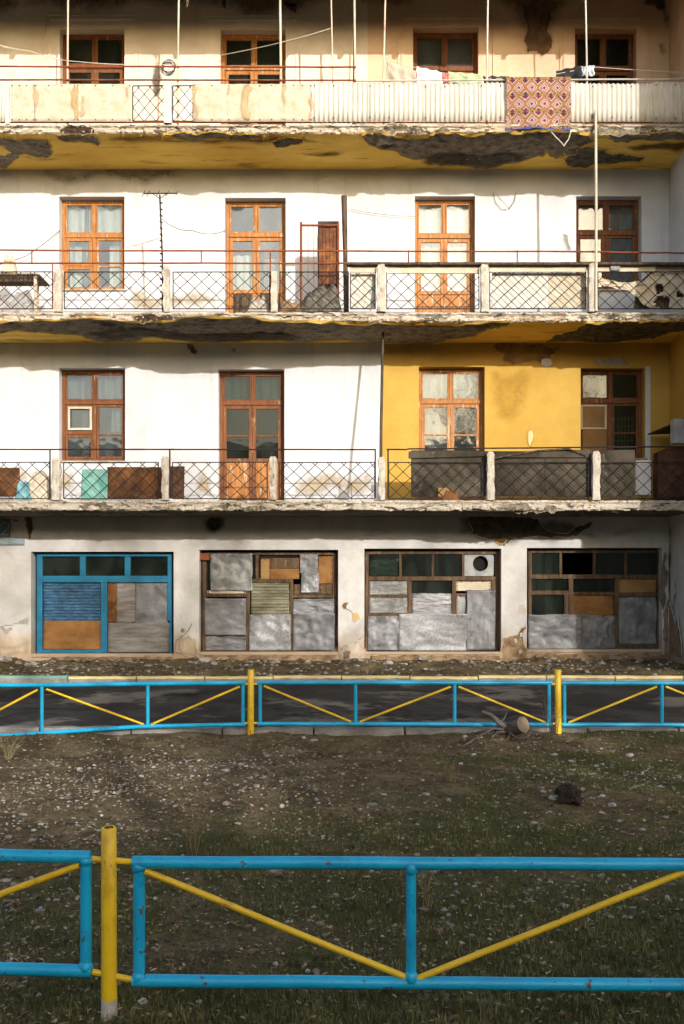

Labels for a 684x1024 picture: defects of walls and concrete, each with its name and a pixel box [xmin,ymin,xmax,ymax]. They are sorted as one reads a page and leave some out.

peeling [522,11,554,58]
spalling [0,124,102,169]
spalling [359,122,684,171]
spalling [0,313,512,357]
spalling [491,312,684,369]
peeling [456,502,621,546]